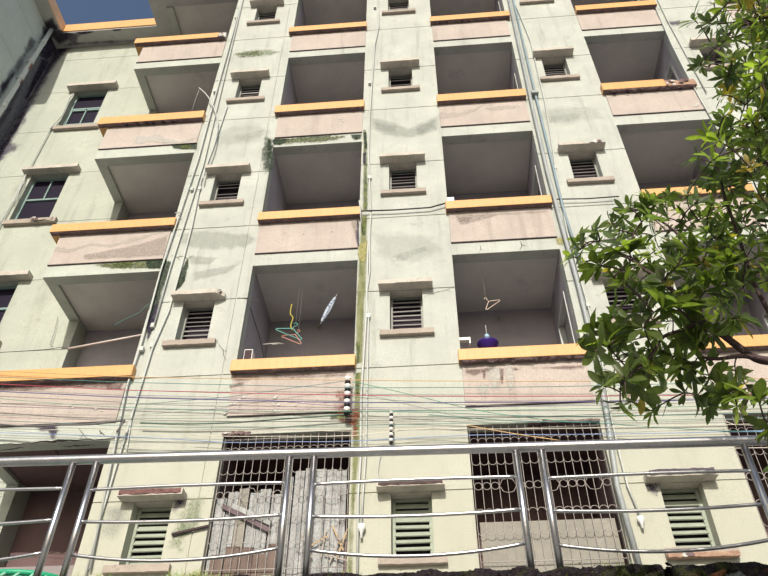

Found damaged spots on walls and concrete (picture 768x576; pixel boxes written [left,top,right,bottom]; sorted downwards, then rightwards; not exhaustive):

water stain [0,18,128,160]
water stain [262,139,287,170]
water stain [352,218,366,246]
water stain [55,231,171,338]
corrosion [331,395,360,437]
crack [665,562,673,576]